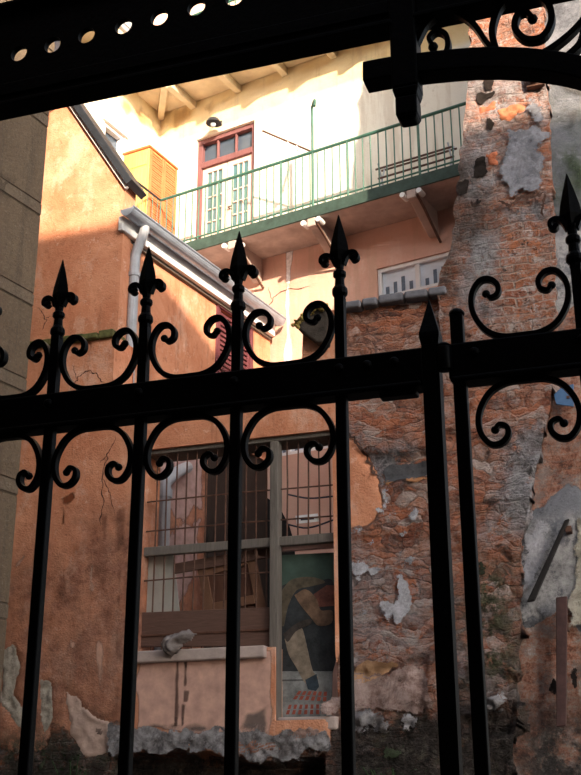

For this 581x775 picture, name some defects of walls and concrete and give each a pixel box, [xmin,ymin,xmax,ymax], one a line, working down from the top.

peeling [456,80,551,199]
crack [99,437,116,526]
peeling [352,560,387,581]
peeling [379,551,414,625]
peeling [522,520,552,596]
peeling [568,517,581,628]
peeling [0,644,22,727]
flaking render [66,692,120,757]
peeling [133,660,226,756]
spalling [239,651,331,764]
flaking render [320,694,340,716]
flaking render [354,660,433,714]